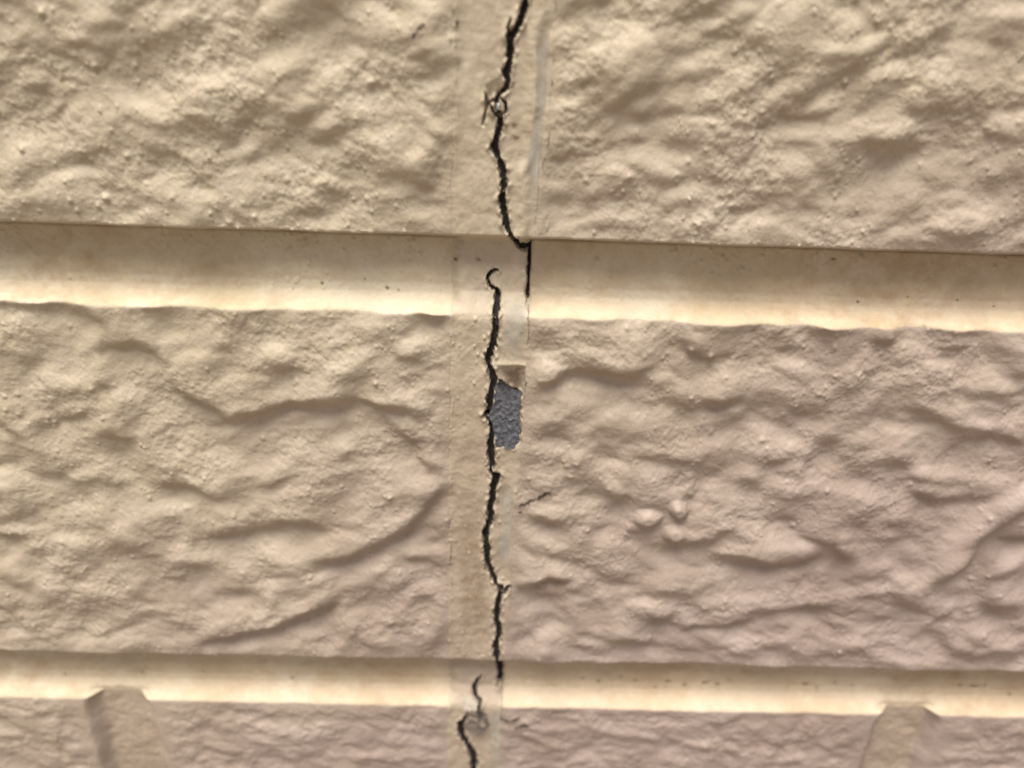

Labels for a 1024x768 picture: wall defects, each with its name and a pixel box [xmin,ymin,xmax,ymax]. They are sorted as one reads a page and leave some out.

crack [485,0,536,344]
crack [457,268,551,768]
peeling [489,370,522,450]